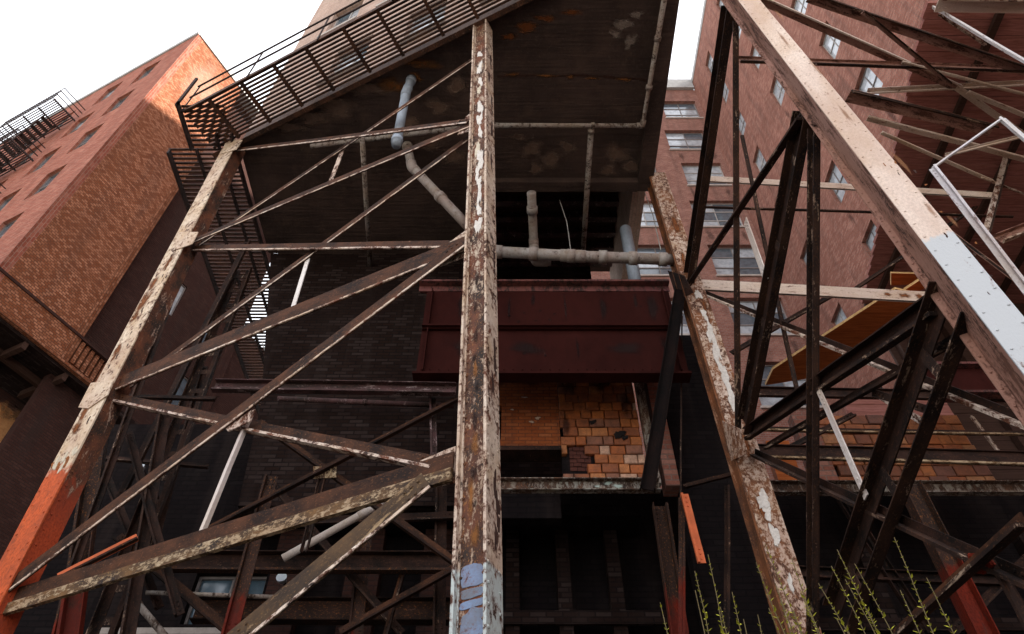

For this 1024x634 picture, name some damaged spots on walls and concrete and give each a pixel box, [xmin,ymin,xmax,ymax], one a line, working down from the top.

peeling [694,290,735,412]
spalling [0,403,16,443]
peeling [51,433,78,474]
spalling [569,444,591,471]
peeling [493,469,501,551]
peeling [756,488,781,547]